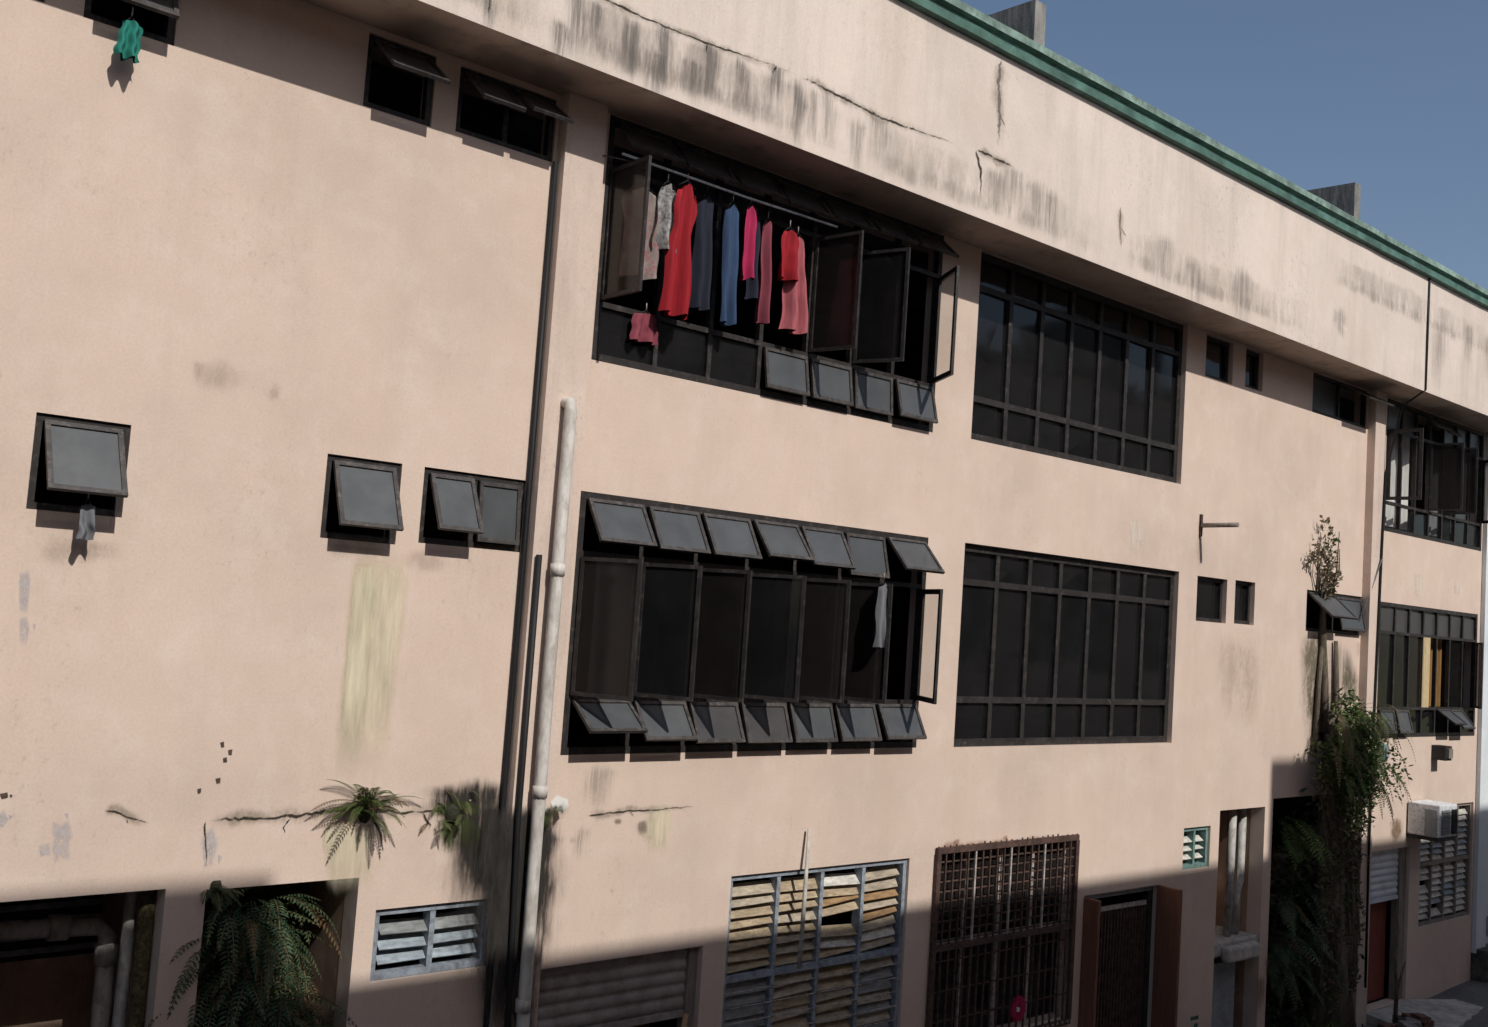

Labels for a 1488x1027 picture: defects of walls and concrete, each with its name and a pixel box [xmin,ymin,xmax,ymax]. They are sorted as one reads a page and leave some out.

water stain [657,29,668,74]
crack [607,0,1010,185]
crack [204,807,438,858]
water stain [435,783,557,1027]